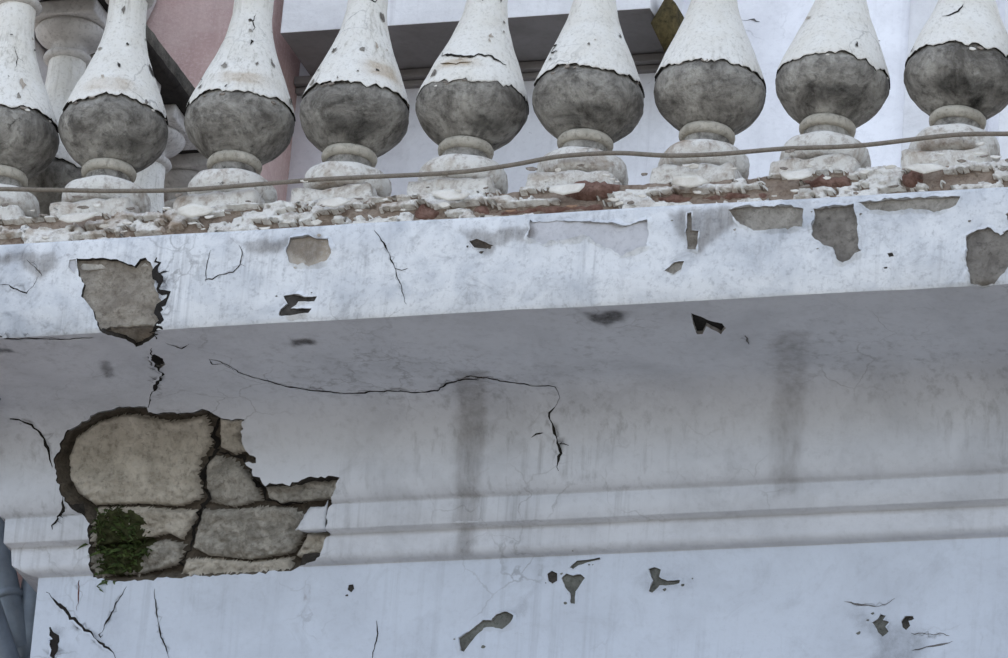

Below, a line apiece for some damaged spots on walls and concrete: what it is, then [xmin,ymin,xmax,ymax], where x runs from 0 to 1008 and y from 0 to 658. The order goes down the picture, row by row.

peeling [0,75,168,179]
peeling [184,42,889,165]
peeling [904,41,1008,120]
peeling [474,142,1008,276]
spalling [66,254,161,347]
crack [145,257,189,408]
crack [374,230,407,302]
crack [10,418,52,468]
spalling [54,407,340,582]
crack [209,359,569,472]
crack [45,581,125,658]
crack [154,589,169,657]